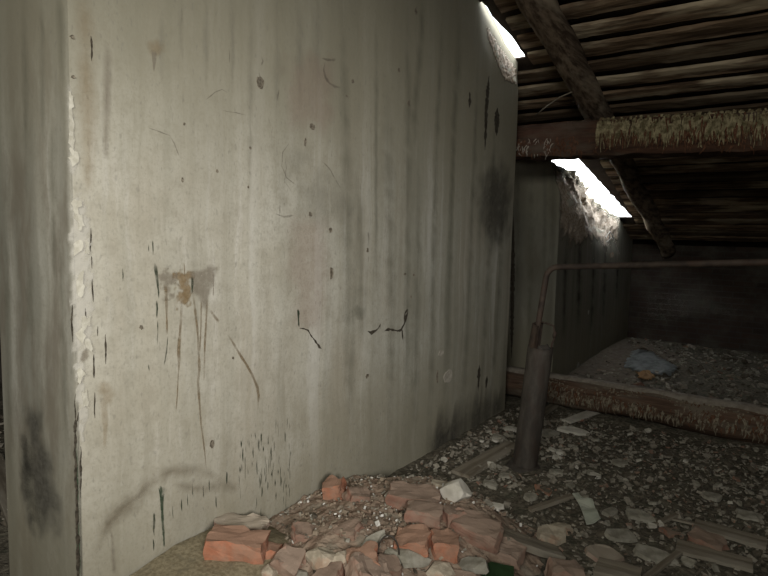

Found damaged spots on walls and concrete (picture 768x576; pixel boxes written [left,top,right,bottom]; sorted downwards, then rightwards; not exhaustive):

spalling [487,29,517,85]
spalling [68,91,79,173]
spalling [554,170,619,258]
water stain [23,415,54,518]